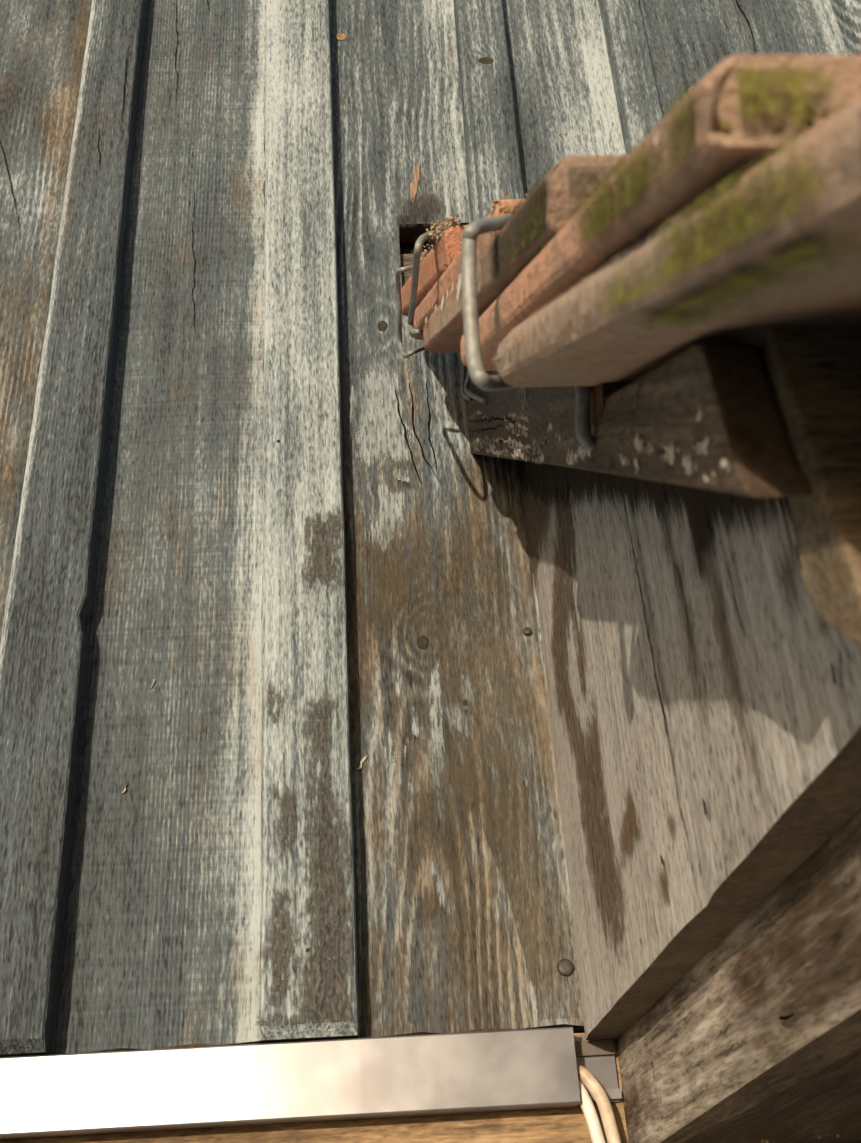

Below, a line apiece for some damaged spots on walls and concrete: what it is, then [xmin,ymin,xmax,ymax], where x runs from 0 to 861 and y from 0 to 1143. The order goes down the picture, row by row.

crack [0,143,21,241]
crack [395,382,440,483]
crack [468,388,529,433]
peeling [617,433,729,483]
leakage [426,460,795,1010]
crack [621,492,697,893]